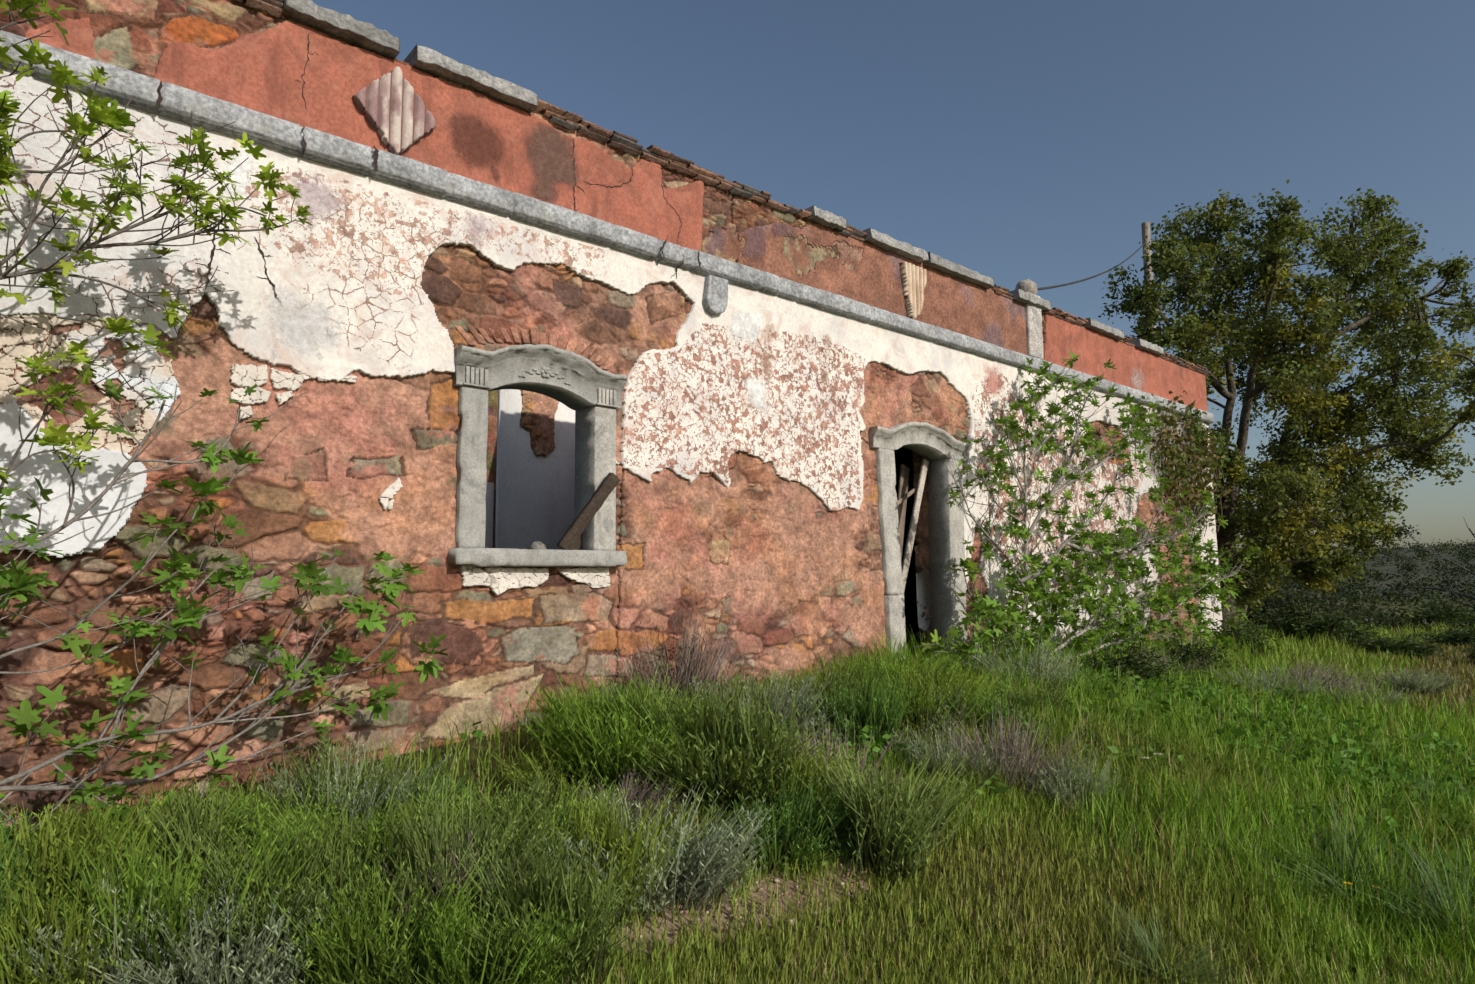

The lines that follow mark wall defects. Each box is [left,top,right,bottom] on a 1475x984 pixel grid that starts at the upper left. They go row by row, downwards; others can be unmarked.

crack [292,34,320,158]
leakage [451,115,503,179]
leakage [527,123,577,202]
crack [0,78,449,372]
crack [570,139,701,279]
flaking render [701,223,746,262]
flaking render [783,234,863,277]
flaking render [0,313,181,454]
flaking render [230,364,357,420]
peeling [624,323,865,511]
flaking render [378,478,403,510]
flaking render [460,564,610,595]